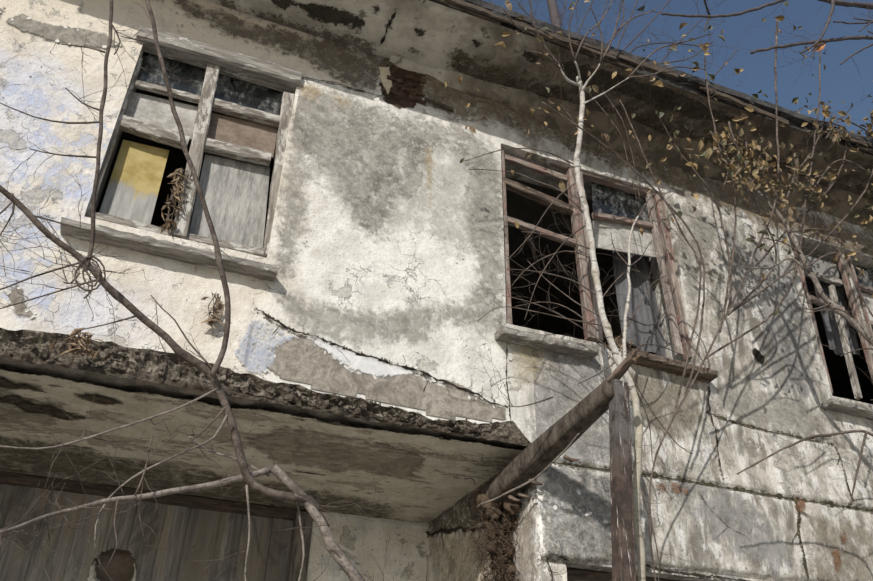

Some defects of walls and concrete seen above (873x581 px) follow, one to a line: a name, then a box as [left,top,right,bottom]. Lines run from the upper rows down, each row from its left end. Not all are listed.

flaking render [0,8,122,48]
peeling [271,0,365,30]
peeling [378,67,392,94]
water stain [174,0,873,347]
flaking render [3,285,35,319]
spalling [0,319,607,446]
crack [254,307,511,420]
water stain [675,205,832,435]
crack [554,460,610,472]
crack [632,382,873,581]